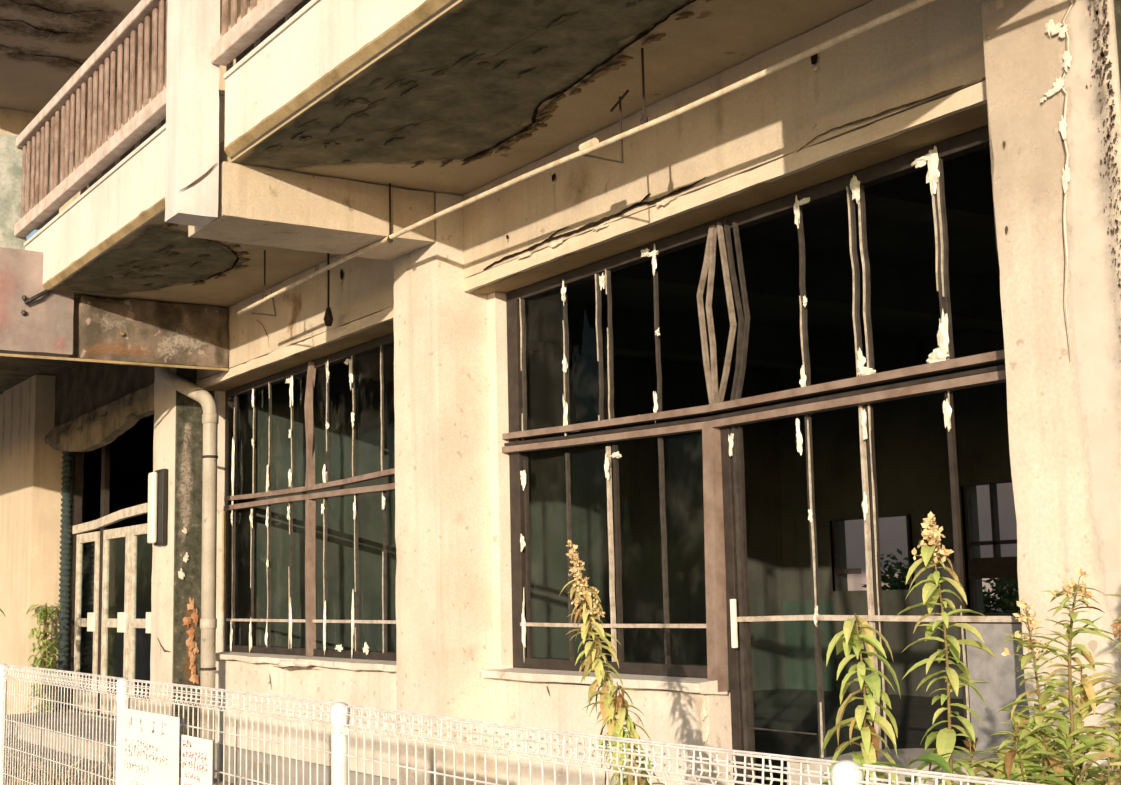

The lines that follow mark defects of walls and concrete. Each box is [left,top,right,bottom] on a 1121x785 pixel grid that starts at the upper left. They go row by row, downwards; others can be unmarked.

peeling [239,0,712,169]
crack [796,77,986,153]
leakage [1086,0,1121,302]
peeling [51,223,250,295]
crack [483,177,706,270]
peeling [156,304,220,358]